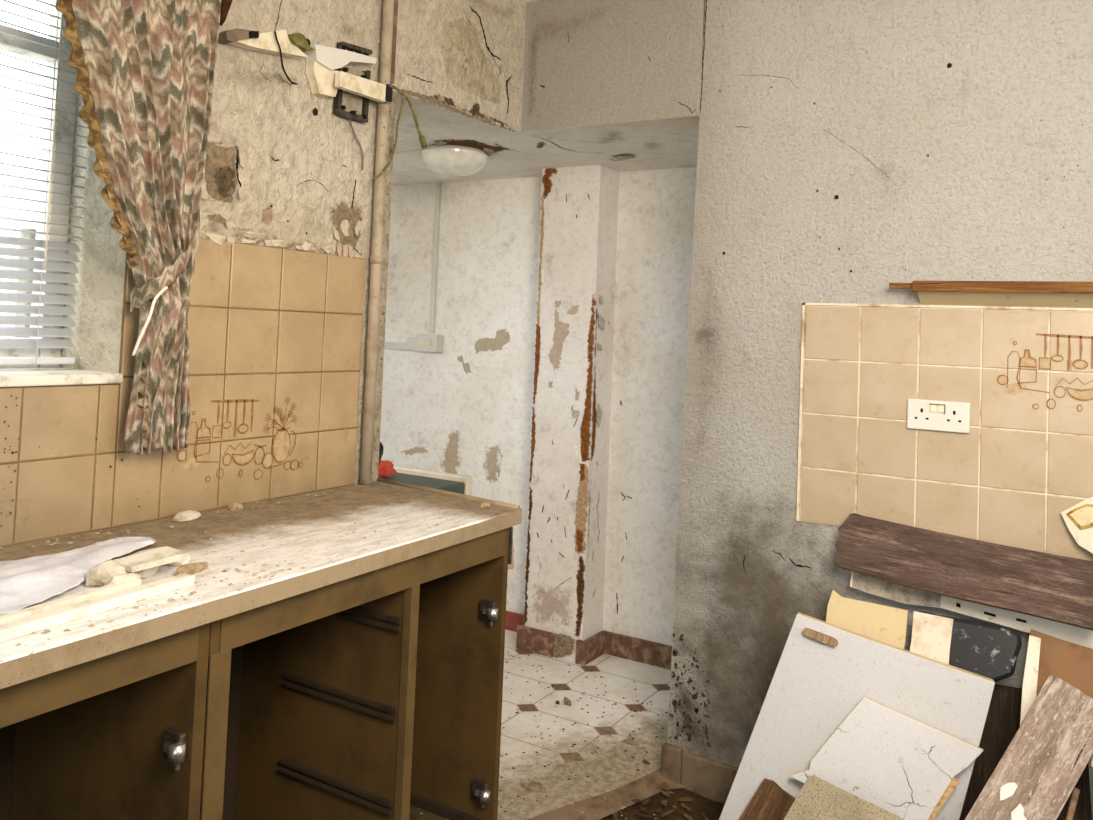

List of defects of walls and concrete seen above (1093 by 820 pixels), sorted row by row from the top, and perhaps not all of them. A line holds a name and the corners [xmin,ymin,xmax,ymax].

crack [469,5,545,113]
crack [679,0,707,113]
spalling [201,138,246,203]
crack [497,137,636,161]
flaking render [200,179,363,259]
peeling [475,329,510,353]
peeling [549,301,578,369]
rust [523,168,558,626]
peeling [484,446,503,481]
rust [572,295,606,637]
spalling [531,577,575,658]
damp [669,526,830,759]